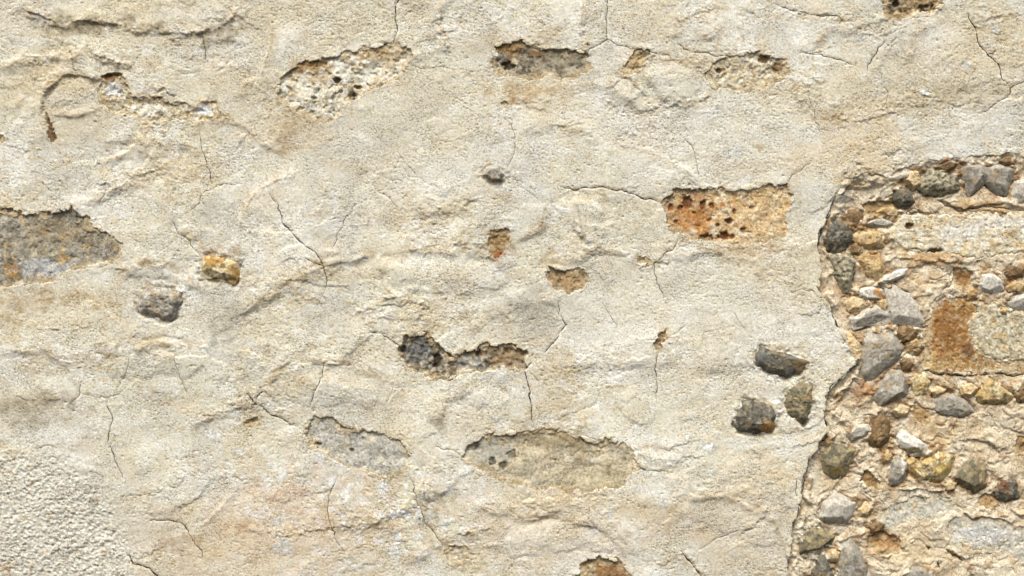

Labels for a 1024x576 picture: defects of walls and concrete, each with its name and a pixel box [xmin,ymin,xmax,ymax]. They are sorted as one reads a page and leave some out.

spalling [275,41,413,123]
spalling [491,39,593,81]
spalling [703,51,790,94]
crack [968,14,1024,114]
spalling [0,207,122,290]
crack [271,197,354,295]
spalling [546,267,589,295]
spalling [662,184,794,245]
spalling [398,331,531,382]
spalling [785,149,1024,576]
spalling [463,425,645,496]
spalling [575,556,631,576]